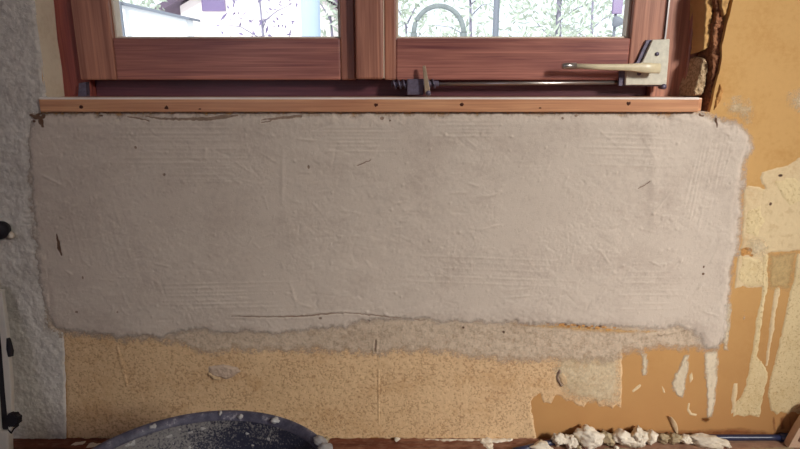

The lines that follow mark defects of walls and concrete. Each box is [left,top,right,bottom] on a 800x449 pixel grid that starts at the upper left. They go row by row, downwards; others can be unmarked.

peeling [735,158,800,288]
crack [231,312,425,321]
spalling [547,323,616,331]
peeling [556,369,567,387]